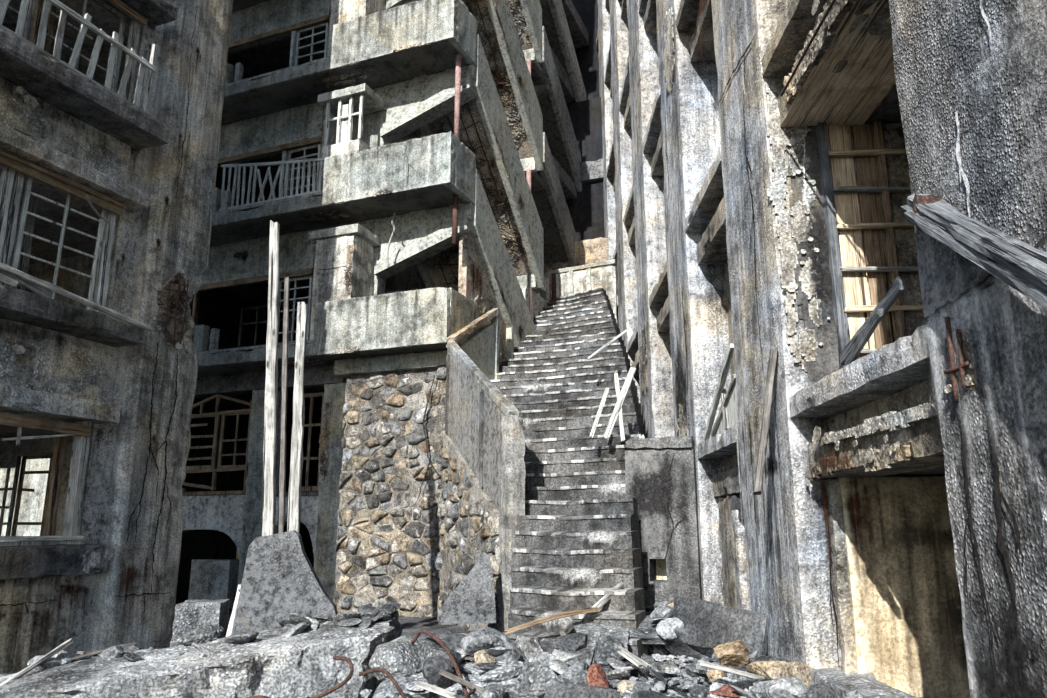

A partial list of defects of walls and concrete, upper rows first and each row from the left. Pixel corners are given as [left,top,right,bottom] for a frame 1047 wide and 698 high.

flaking render [765,0,857,386]
corrosion [0,584,89,641]
crack [115,342,178,615]